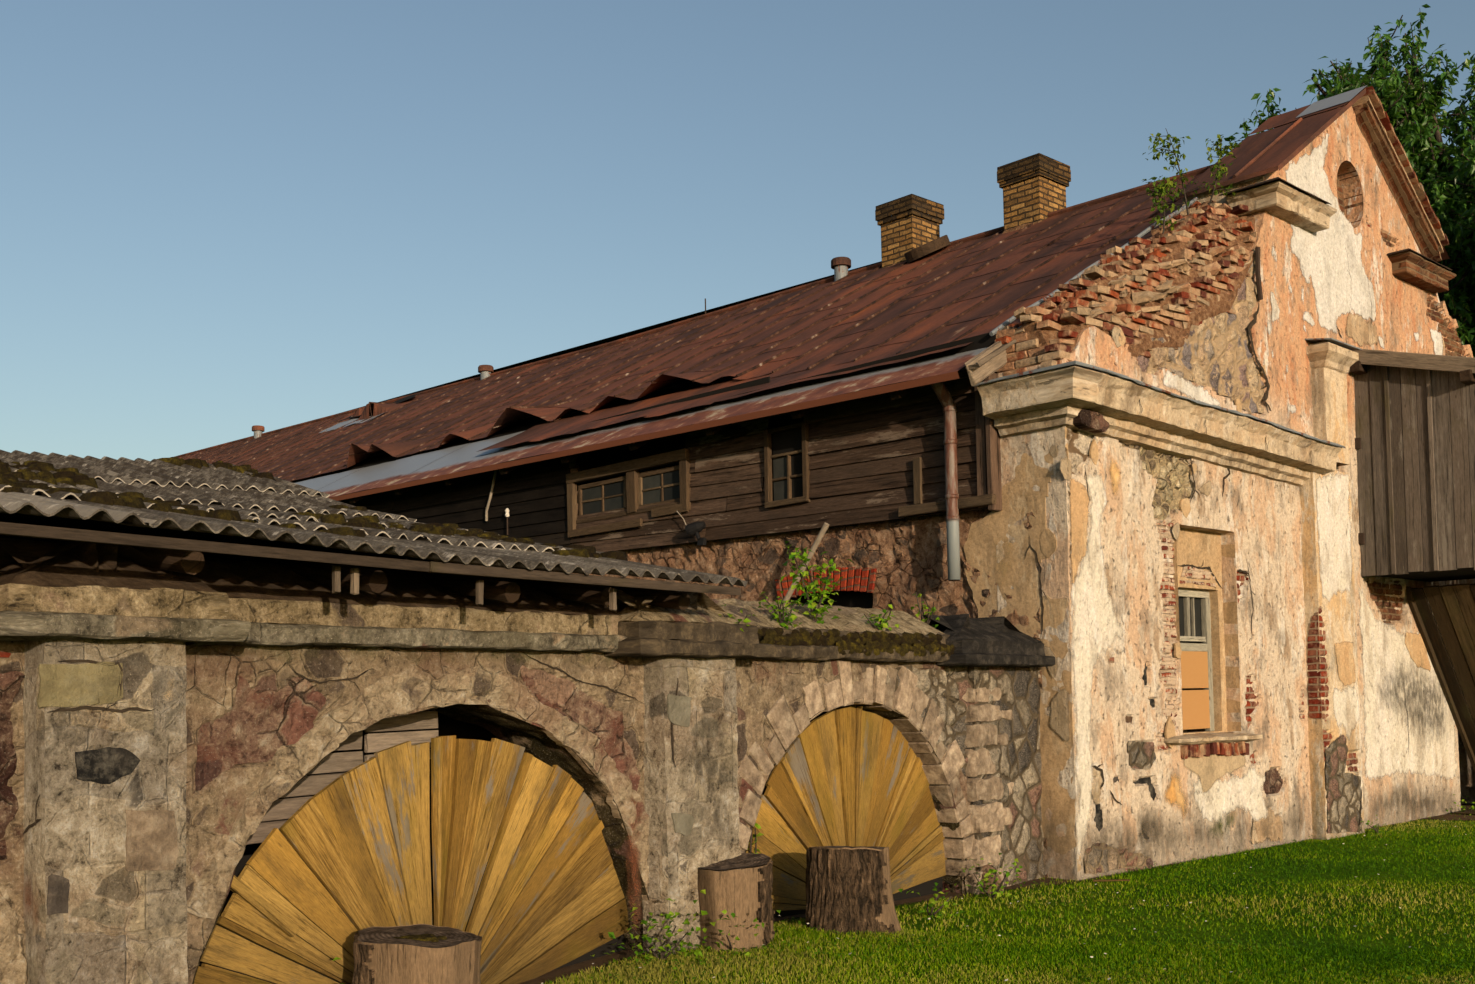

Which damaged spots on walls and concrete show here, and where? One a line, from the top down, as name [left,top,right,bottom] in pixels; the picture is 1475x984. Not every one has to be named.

spalling [1009,215,1280,362]
peeling [1163,370,1242,412]
crack [1025,537,1048,631]
spalling [1236,572,1249,603]
spalling [1084,439,1211,874]
spalling [1245,676,1259,728]
spalling [1299,606,1363,834]